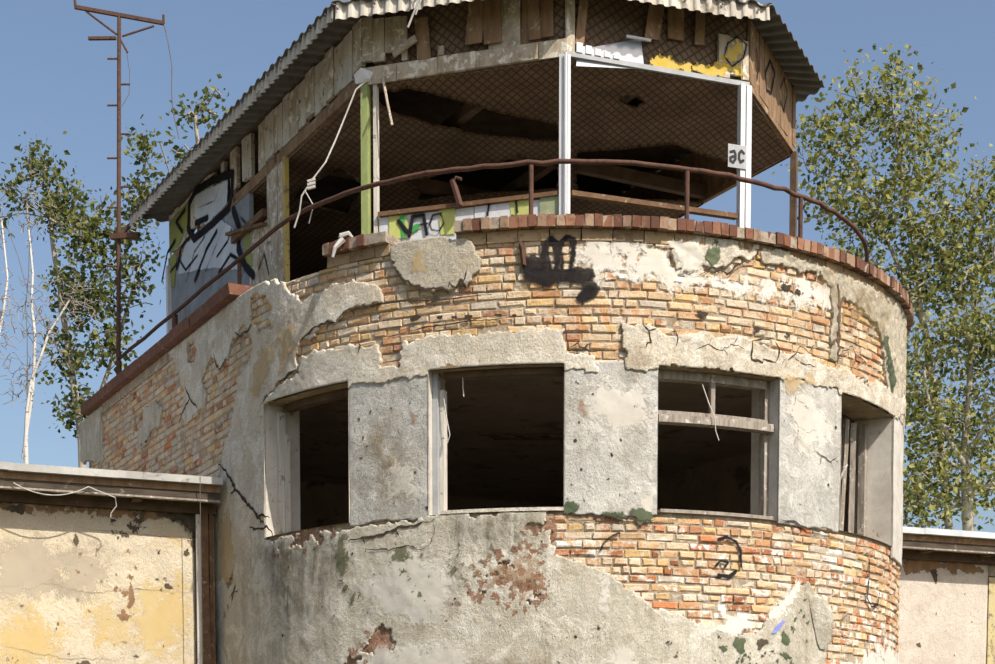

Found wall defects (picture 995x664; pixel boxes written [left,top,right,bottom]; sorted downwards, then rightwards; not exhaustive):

crack [301,270,501,340]
spalling [267,239,897,397]
spalling [91,295,273,477]
crack [278,370,299,384]
peeling [108,510,169,539]
crack [217,463,275,537]
crack [348,519,435,551]
spalling [107,565,137,622]
spalling [439,492,984,664]
spalling [345,624,399,664]